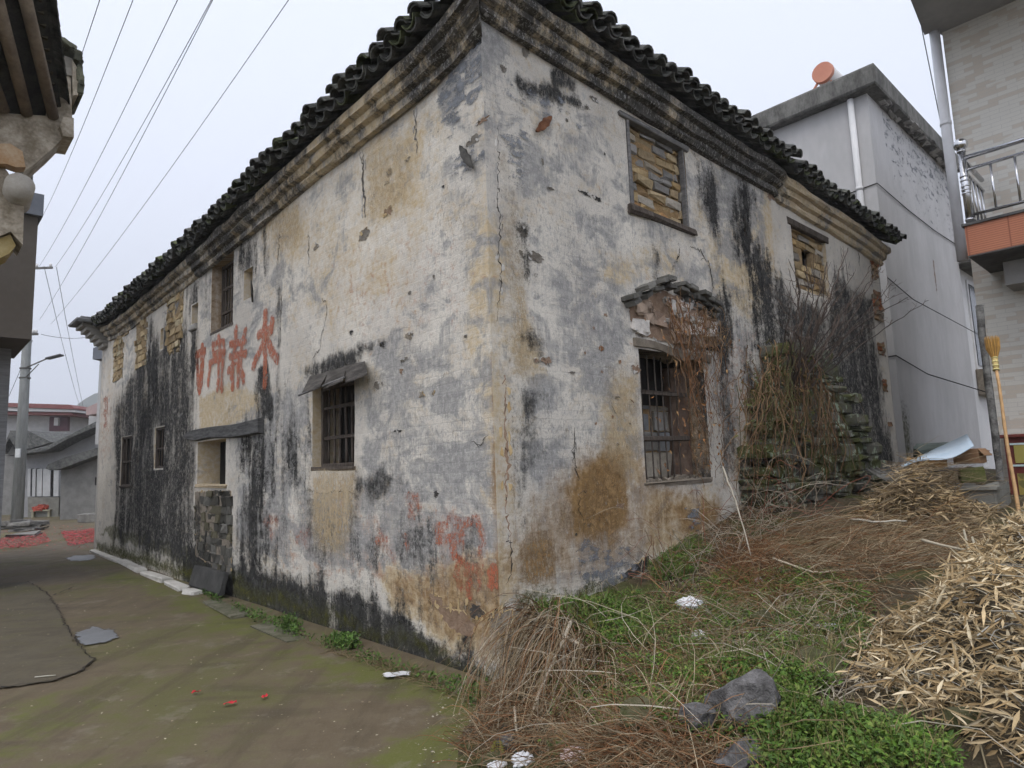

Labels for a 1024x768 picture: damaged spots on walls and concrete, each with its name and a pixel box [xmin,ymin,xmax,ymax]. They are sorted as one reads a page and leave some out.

crack [358,151,366,218]
crack [411,106,419,153]
crack [495,128,505,320]
water stain [511,223,542,370]
spalling [629,290,718,353]
water stain [698,167,894,467]
water stain [110,320,485,678]